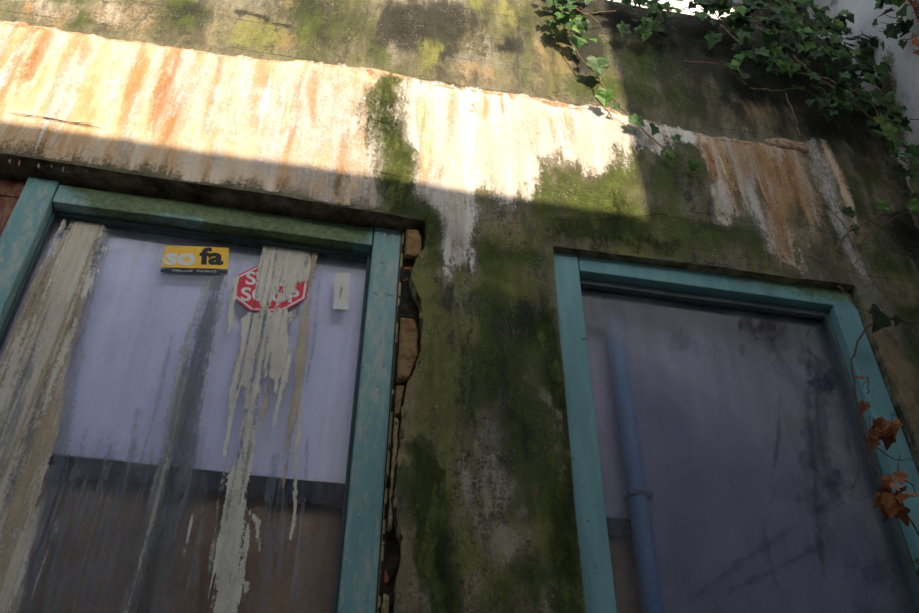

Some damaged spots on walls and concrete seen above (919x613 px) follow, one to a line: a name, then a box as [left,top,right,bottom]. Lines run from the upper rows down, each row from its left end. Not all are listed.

leakage [0,21,863,277]
spalling [377,228,428,613]